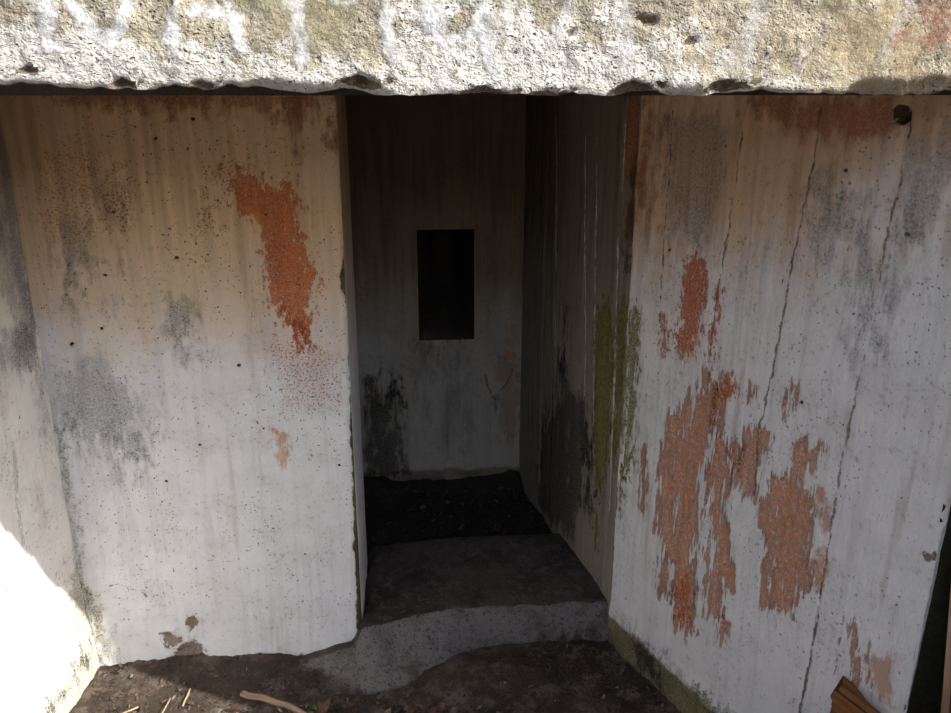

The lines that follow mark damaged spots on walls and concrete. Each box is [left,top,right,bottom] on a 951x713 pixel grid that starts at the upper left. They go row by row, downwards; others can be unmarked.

crack [805,109,821,203]
rust [189,161,342,421]
damp [363,369,410,480]
damp [536,295,628,552]
peeling [637,363,830,646]
crack [754,225,801,496]
spalling [159,613,207,658]